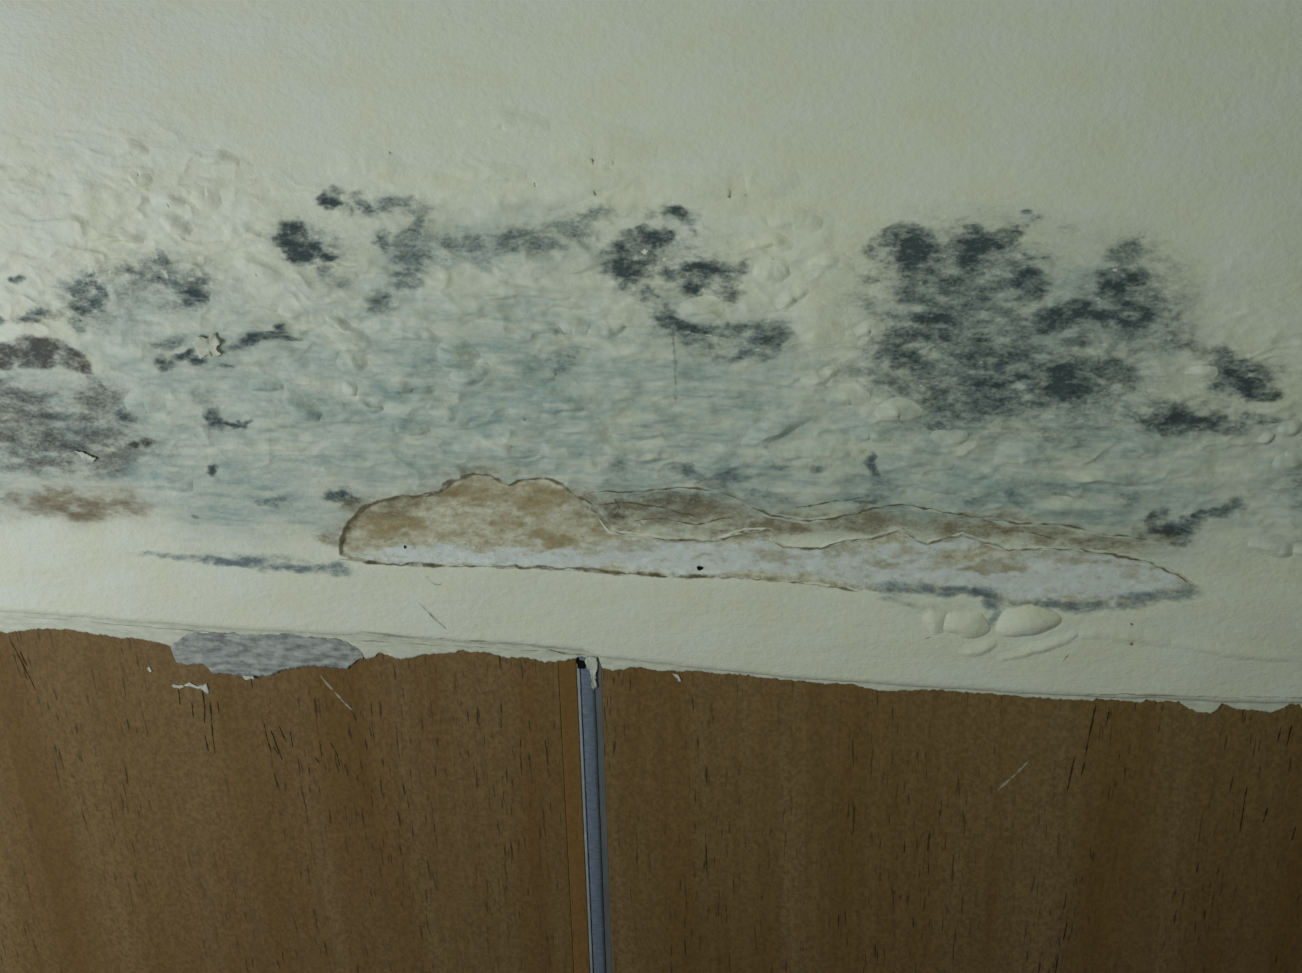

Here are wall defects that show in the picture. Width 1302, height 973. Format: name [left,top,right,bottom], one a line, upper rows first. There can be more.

water stain [0,308,89,373]
water stain [68,274,108,331]
water stain [125,255,209,307]
water stain [153,340,206,371]
water stain [232,324,299,350]
water stain [272,222,338,272]
water stain [316,189,606,312]
water stain [603,206,791,361]
water stain [865,210,1177,430]
water stain [1132,347,1282,436]
water stain [202,555,346,574]
peeling [339,473,1198,610]